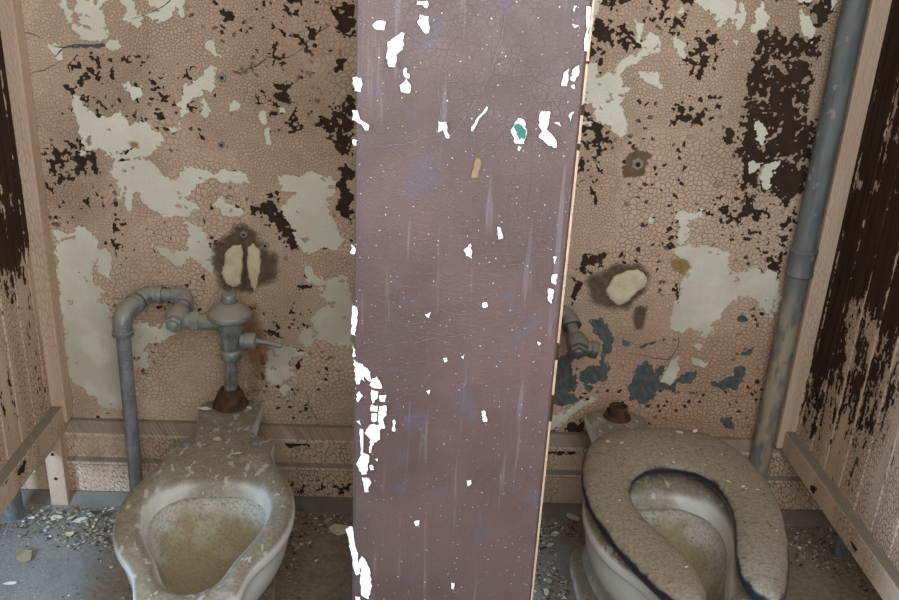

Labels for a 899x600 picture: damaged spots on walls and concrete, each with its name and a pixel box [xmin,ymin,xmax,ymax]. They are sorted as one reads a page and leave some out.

crack [25,32,102,73]
crack [237,0,333,75]
peeling [252,0,356,145]
peeling [386,32,411,93]
peeling [417,1,430,33]
peeling [0,31,31,304]
peeling [41,0,249,411]
water stain [213,225,276,292]
peeling [212,77,396,494]
peeling [539,0,837,405]
peeling [799,0,899,452]
peeling [344,523,372,600]